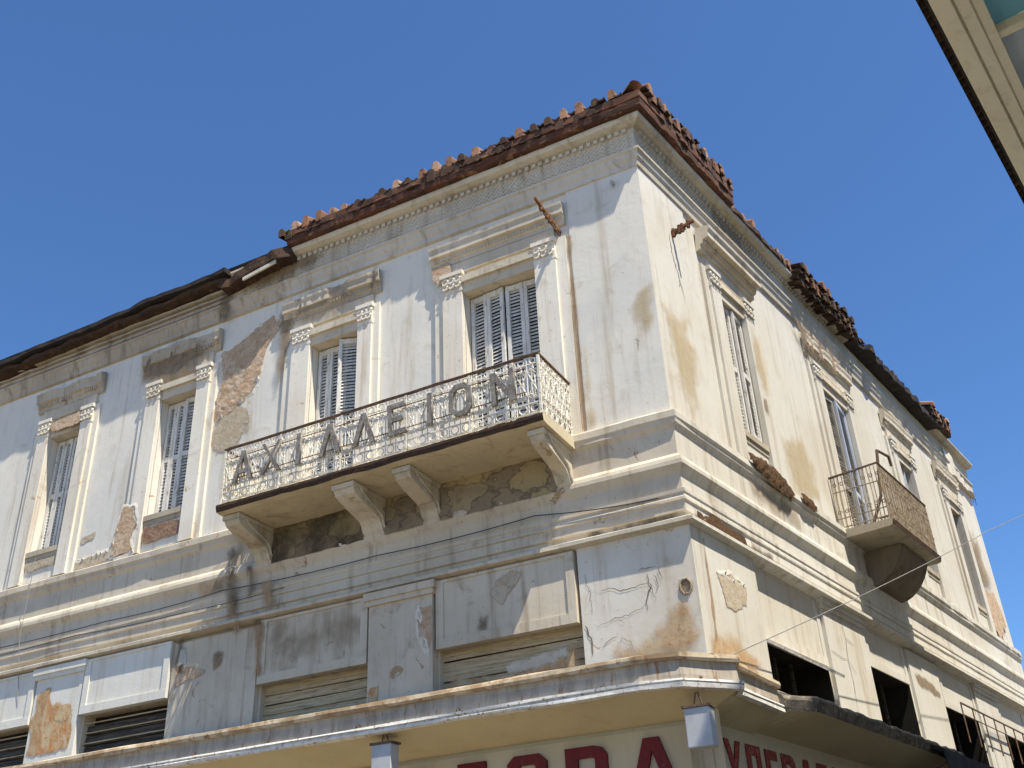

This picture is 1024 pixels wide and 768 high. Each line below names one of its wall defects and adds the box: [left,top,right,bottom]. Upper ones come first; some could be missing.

flaking render [211,313,281,453]
flaking render [73,502,180,571]
flaking render [415,605,432,657]
crack [584,566,662,655]
flaking render [716,569,747,611]
peeling [27,688,72,756]